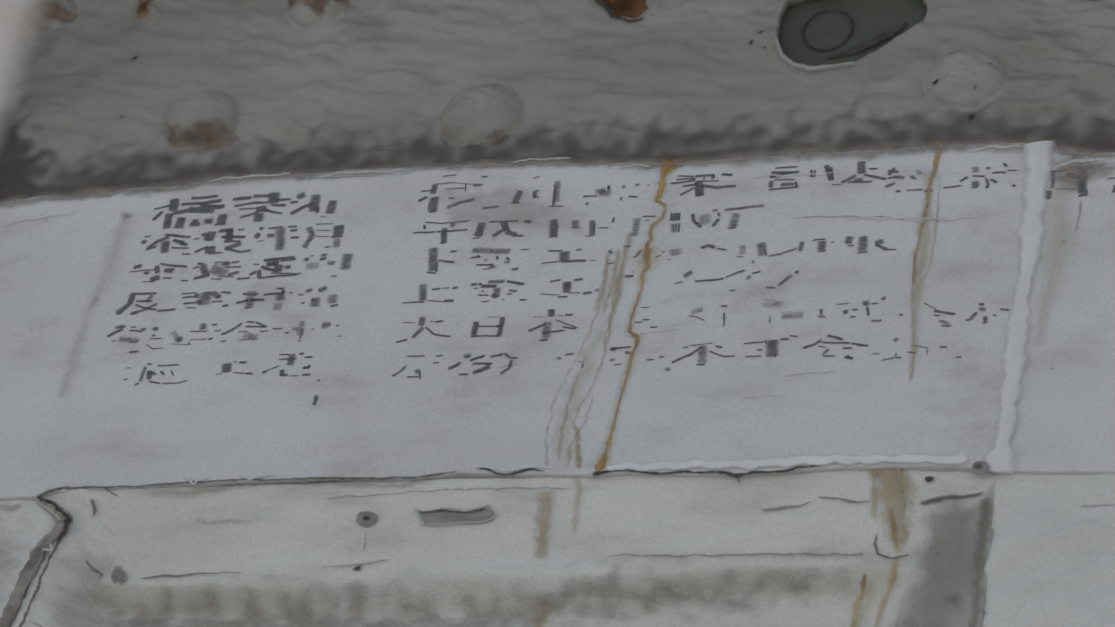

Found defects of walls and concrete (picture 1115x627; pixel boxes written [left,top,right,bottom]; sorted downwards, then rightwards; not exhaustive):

rust [29,0,76,33]
rust [290,0,348,13]
rust [595,0,650,22]
rust [913,144,943,284]
spalling [416,505,495,525]
rust [537,492,549,556]
rust [872,469,911,542]
water stain [971,500,988,627]
rust [851,574,866,627]